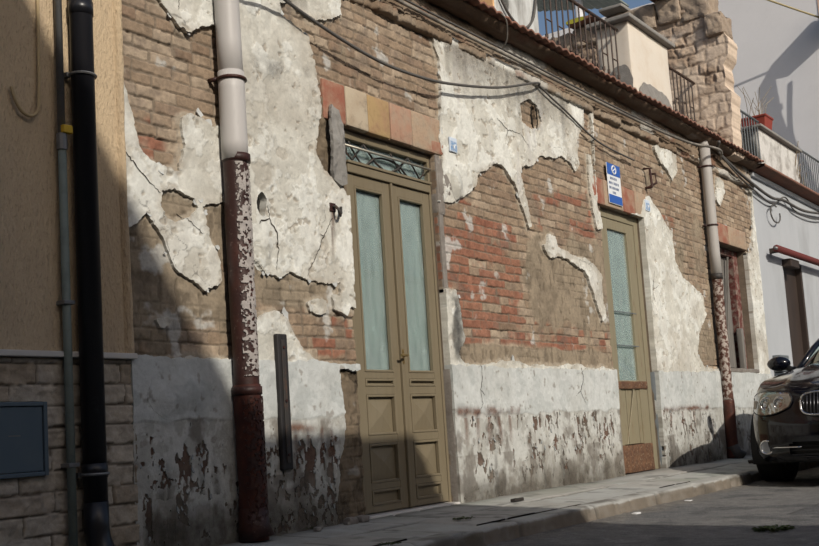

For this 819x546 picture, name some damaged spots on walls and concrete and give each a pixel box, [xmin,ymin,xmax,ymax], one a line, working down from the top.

spalling [122,0,220,174]
spalling [280,0,443,194]
spalling [520,100,541,135]
spalling [129,189,233,359]
spalling [235,161,366,533]
spalling [434,112,720,370]
spalling [712,172,753,255]
peeling [140,434,226,544]
peeling [475,416,501,482]
peeling [513,411,614,476]